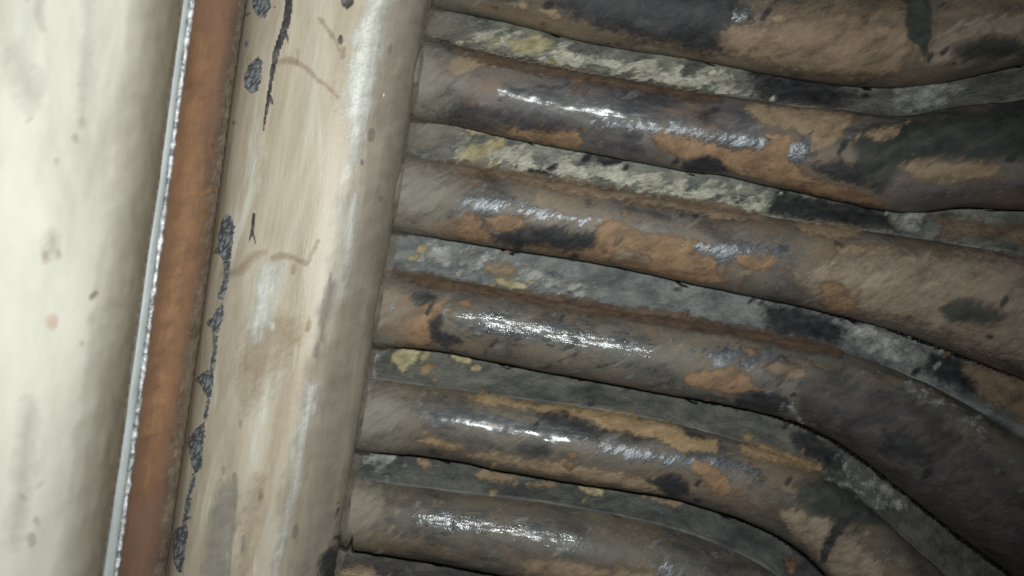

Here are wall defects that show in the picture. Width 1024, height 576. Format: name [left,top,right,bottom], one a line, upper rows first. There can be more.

peeling [244,57,263,94]
crack [263,0,292,131]
rust [442,44,723,103]
rust [499,125,588,150]
rust [647,129,884,208]
rust [143,33,214,499]
peeling [173,214,235,573]
rust [962,361,1024,423]
rust [464,451,667,495]
rust [687,459,744,505]